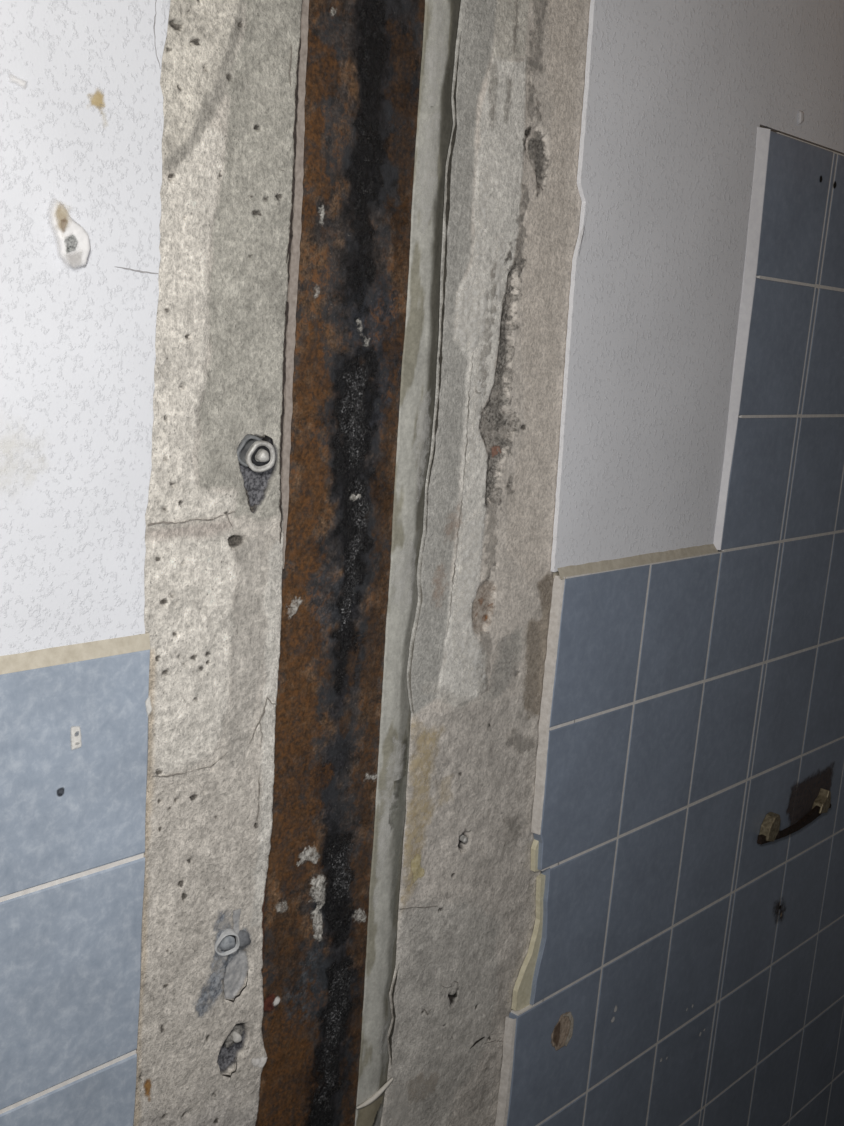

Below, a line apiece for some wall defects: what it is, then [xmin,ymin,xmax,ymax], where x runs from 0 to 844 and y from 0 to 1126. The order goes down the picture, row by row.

spalling [476,84,549,529]
crack [409,31,462,714]
spalling [225,512,242,547]
spalling [239,435,277,513]
crack [447,358,473,631]
spalling [473,542,497,690]
damp [538,575,554,606]
peeling [297,846,319,866]
peeling [312,907,323,941]
spalling [217,1023,245,1078]
rust [263,994,280,1011]
crack [388,968,399,1065]